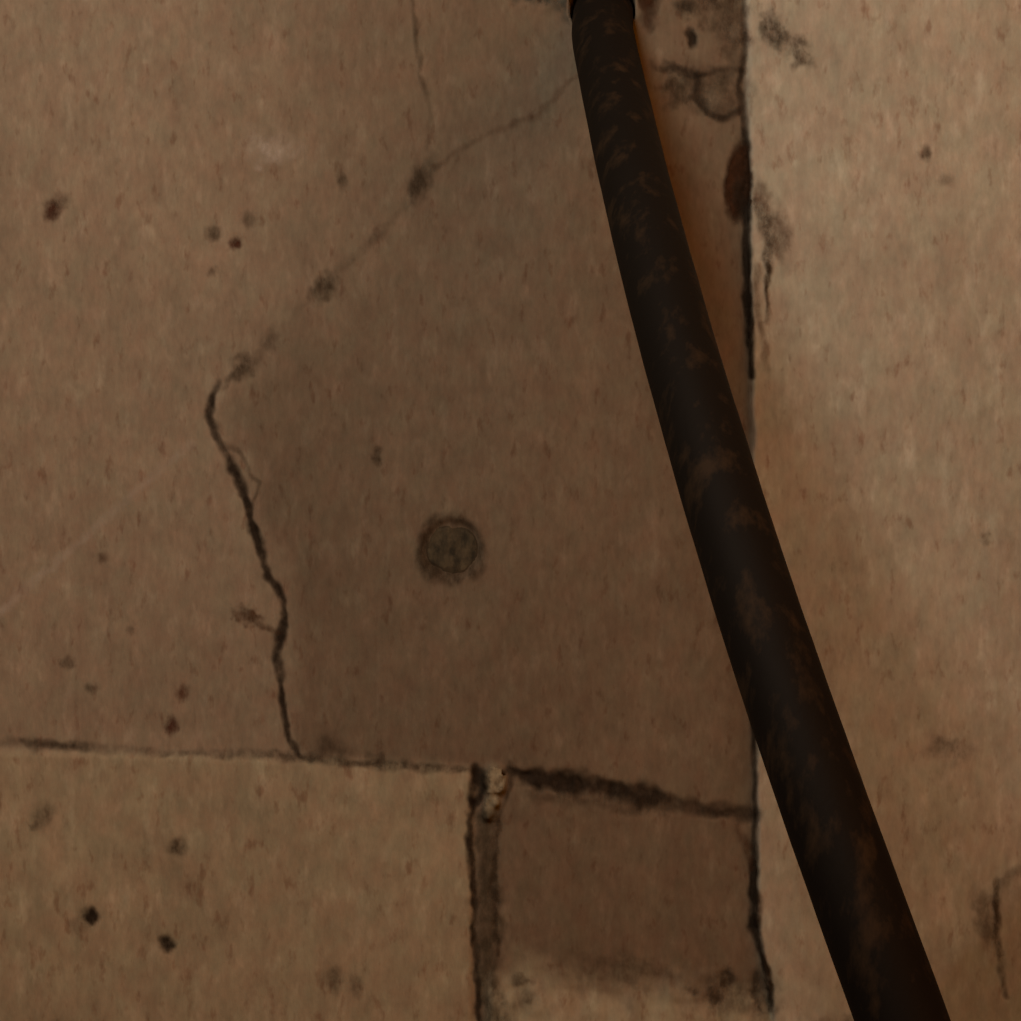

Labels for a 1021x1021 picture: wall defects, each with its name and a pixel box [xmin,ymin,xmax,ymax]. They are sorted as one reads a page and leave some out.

crack [410,169,427,196]
leakage [764,240,777,307]
crack [206,364,300,759]